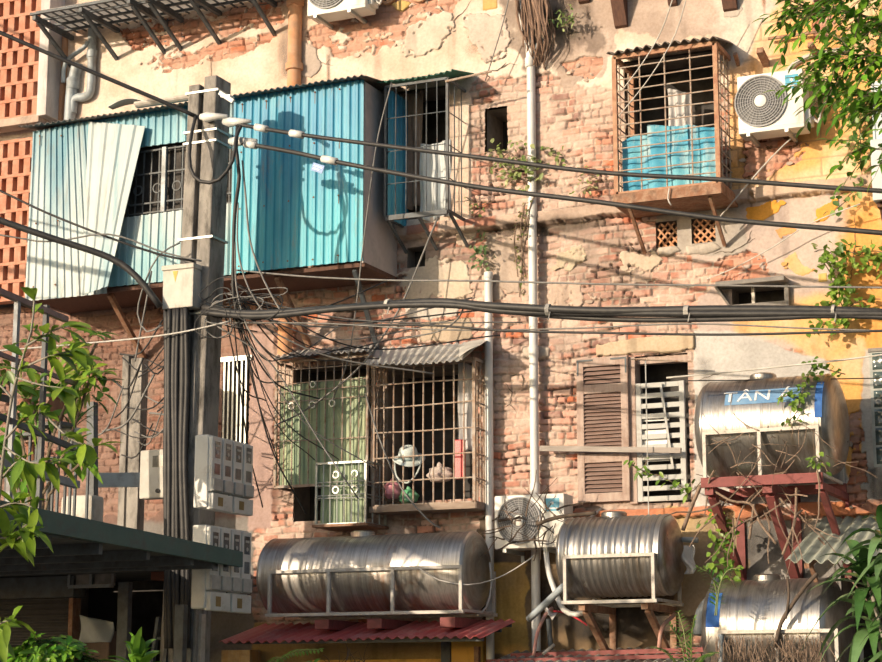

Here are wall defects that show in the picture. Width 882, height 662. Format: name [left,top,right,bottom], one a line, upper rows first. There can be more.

spalling [120,1,285,73]
spalling [301,0,514,78]
spalling [562,56,603,82]
spalling [739,137,809,180]
spalling [718,250,788,281]
spalling [847,410,869,509]